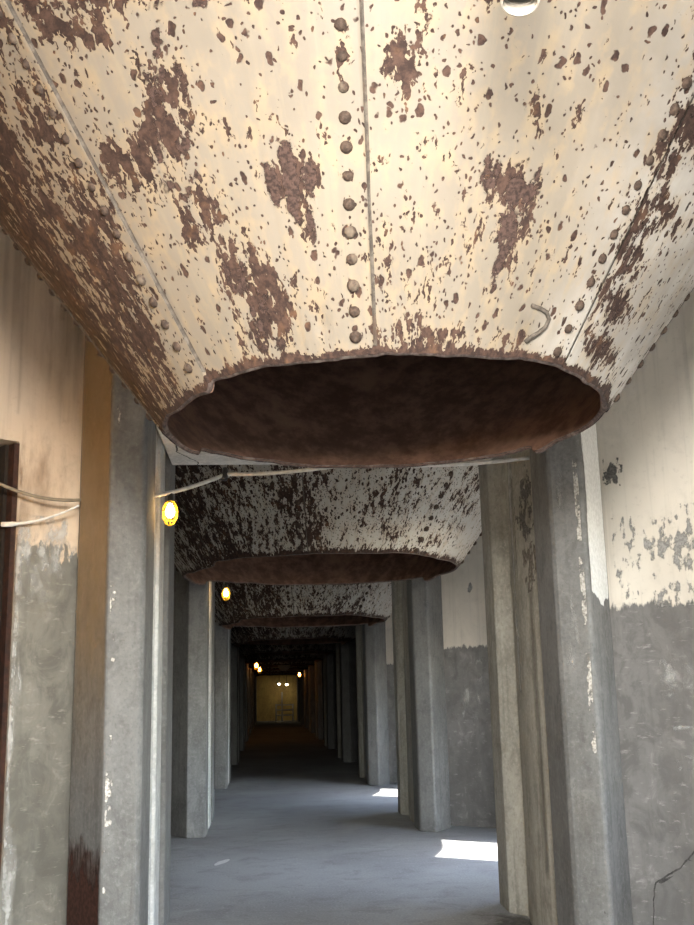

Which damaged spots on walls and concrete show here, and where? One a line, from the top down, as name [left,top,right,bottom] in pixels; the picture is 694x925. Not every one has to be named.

rust [192,0,208,8]
rust [138,27,166,108]
rust [151,122,165,165]
rust [161,169,203,202]
rust [175,137,191,156]
rust [264,140,317,245]
rust [480,153,543,287]
rust [588,128,694,370]
rust [222,260,286,353]
peeling [572,423,694,625]
rust [67,839,100,925]